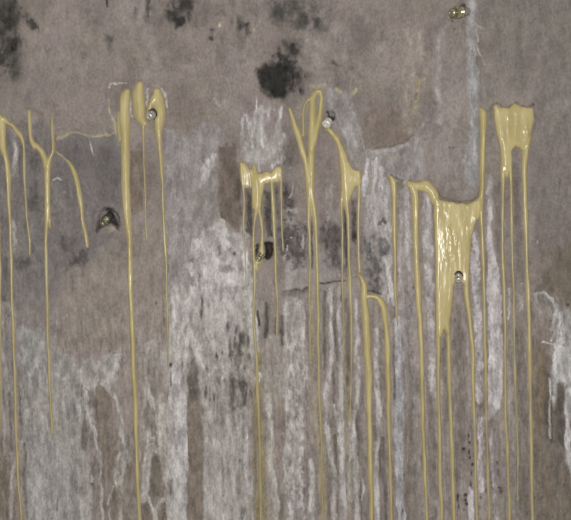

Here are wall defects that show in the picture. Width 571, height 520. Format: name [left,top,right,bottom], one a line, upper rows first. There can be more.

damp [0,0,368,520]
crack [279,275,358,299]
crack [368,288,383,296]
damp [356,0,571,520]